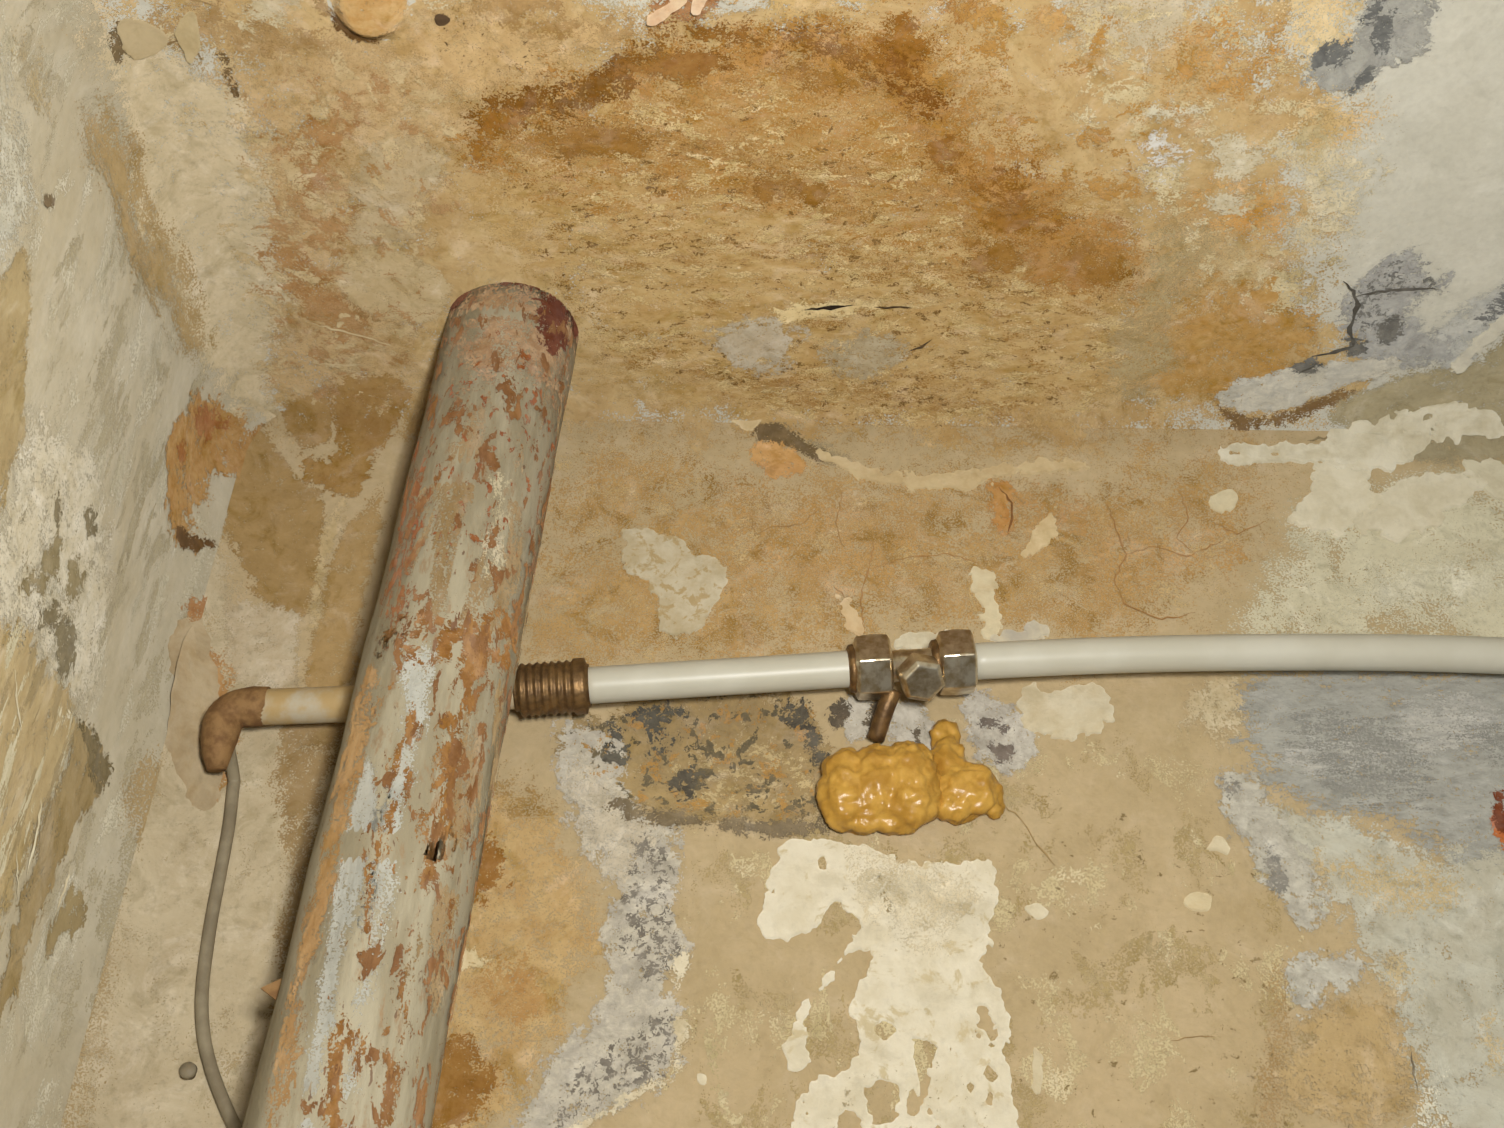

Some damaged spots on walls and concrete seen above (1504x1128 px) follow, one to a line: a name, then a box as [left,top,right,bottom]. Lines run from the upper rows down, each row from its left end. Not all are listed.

water stain [8,0,1504,667]
flaking render [504,0,1504,664]
water stain [15,799,149,1128]
water stain [70,430,190,799]
rust [181,594,208,622]
rust [209,647,238,697]
rust [262,282,613,1128]
peeling [504,671,1504,1128]
rust [1489,789,1504,850]